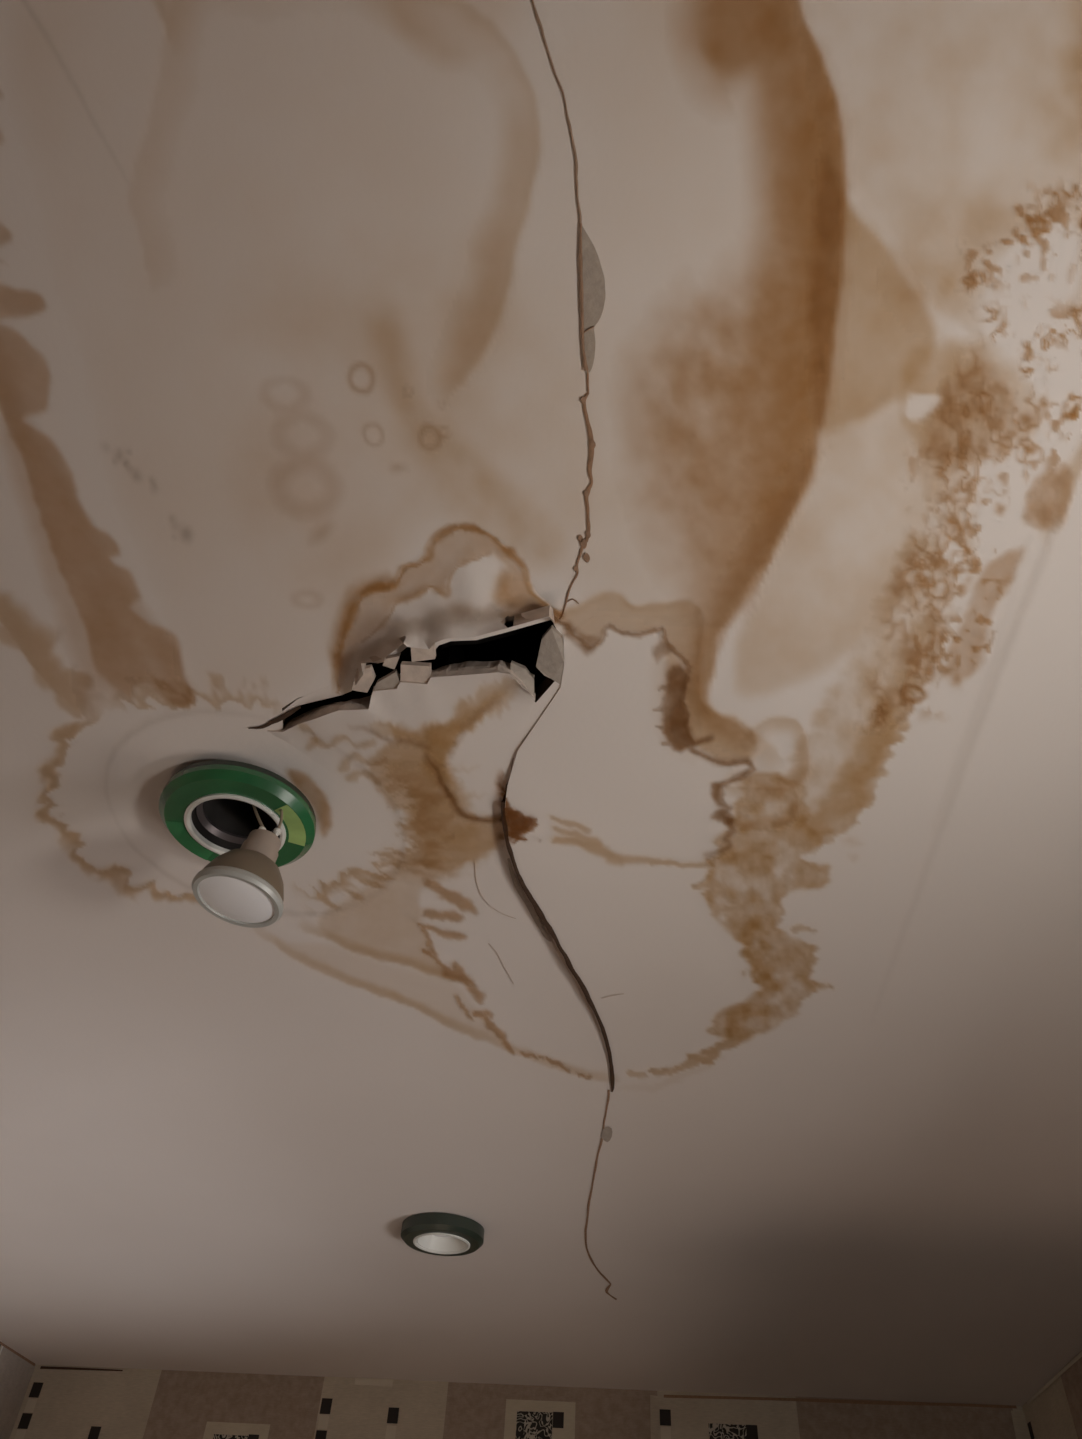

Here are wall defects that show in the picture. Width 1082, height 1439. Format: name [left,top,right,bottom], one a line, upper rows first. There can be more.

crack [531,0,582,226]
crack [248,370,596,732]
crack [474,758,624,1300]